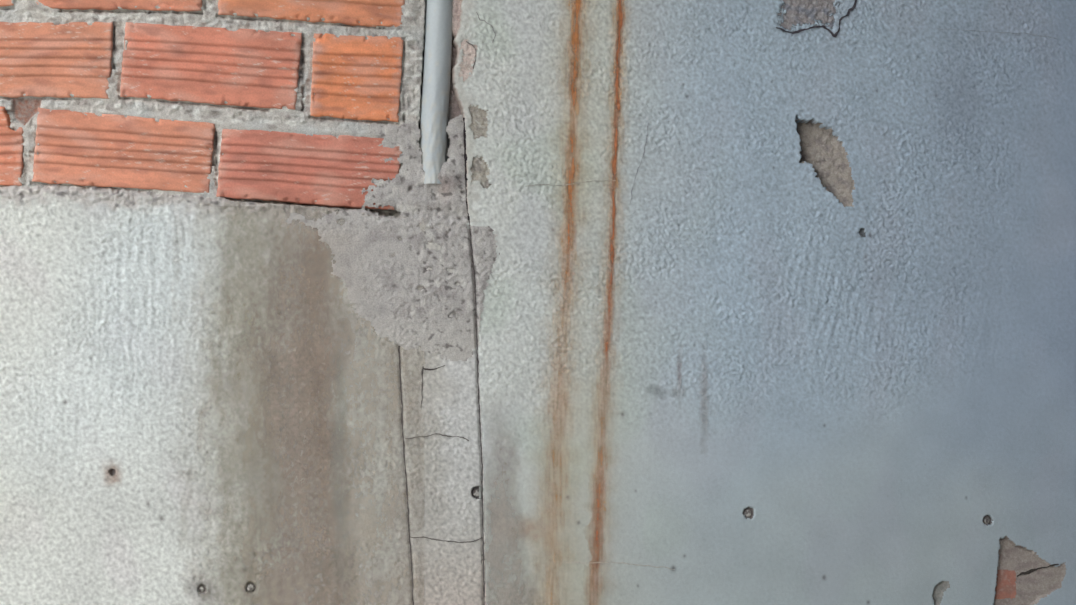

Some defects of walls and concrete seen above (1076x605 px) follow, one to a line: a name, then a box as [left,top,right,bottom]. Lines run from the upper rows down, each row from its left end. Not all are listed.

rust [569,0,580,113]
spalling [777,0,836,32]
peeling [468,104,489,139]
peeling [470,157,492,189]
rust [609,0,623,317]
spalling [795,119,855,207]
crack [398,118,485,605]
damp [240,223,416,605]
spalling [932,581,950,605]
spalling [994,536,1067,605]